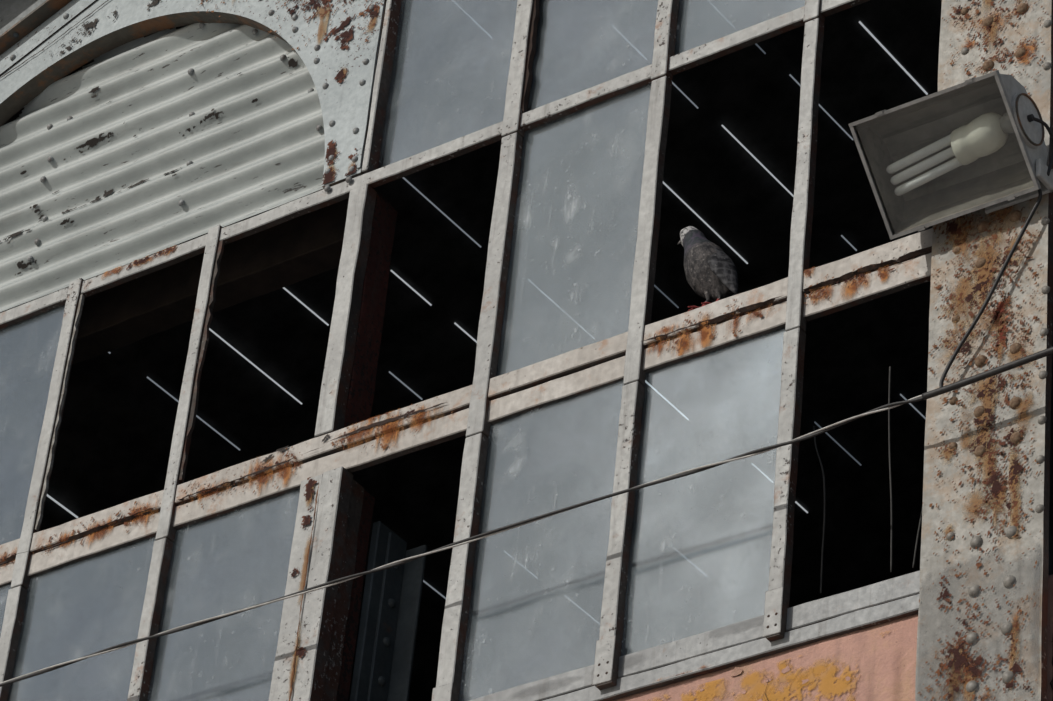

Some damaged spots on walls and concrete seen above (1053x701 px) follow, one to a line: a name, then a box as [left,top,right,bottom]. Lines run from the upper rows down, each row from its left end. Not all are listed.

rust [268,0,383,50]
rust [942,0,1049,94]
rust [321,140,357,185]
rust [645,299,763,356]
rust [332,404,431,453]
rust [918,199,1044,701]
rust [33,446,317,600]
rust [289,634,306,696]
peeling [654,655,860,701]